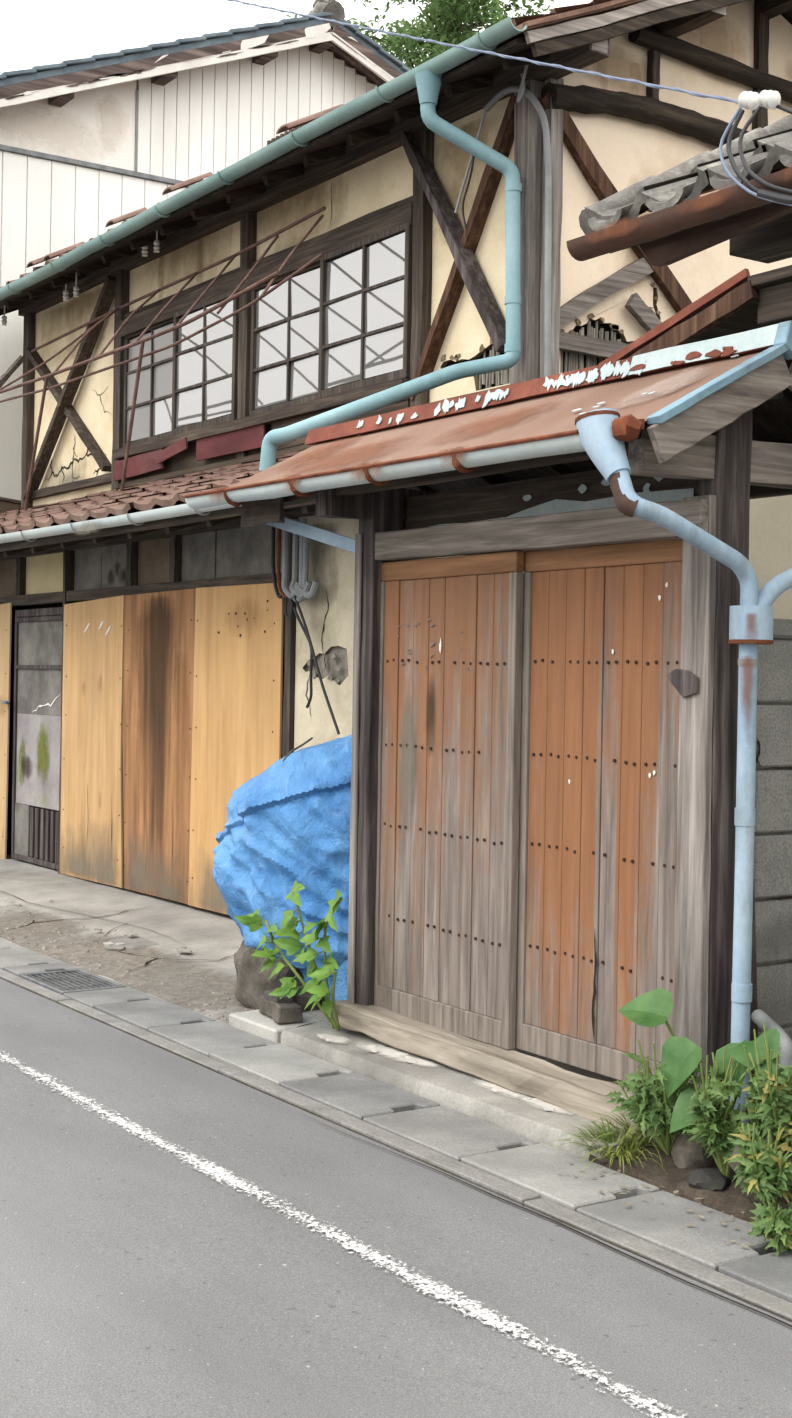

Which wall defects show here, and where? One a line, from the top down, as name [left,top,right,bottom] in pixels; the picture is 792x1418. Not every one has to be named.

corrosion [694,192,720,209]
peeling [543,322,784,397]
peeling [356,388,509,428]
crack [45,436,106,480]
corrosion [184,408,643,508]
leakage [144,599,169,770]
leakage [20,742,29,778]